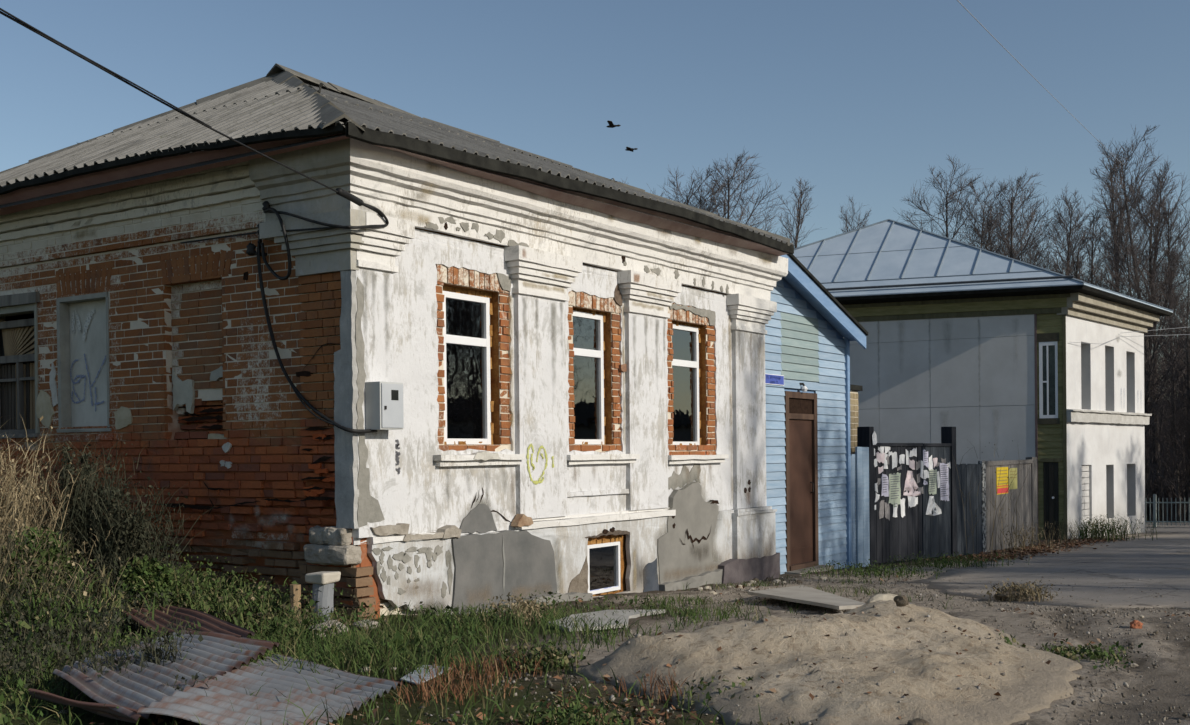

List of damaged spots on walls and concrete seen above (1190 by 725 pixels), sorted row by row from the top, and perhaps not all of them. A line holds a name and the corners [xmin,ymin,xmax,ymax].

peeling [424,216,529,247]
peeling [36,362,58,429]
peeling [114,406,133,430]
peeling [172,369,232,469]
spalling [301,427,335,497]
peeling [355,277,462,598]
peeling [668,463,701,490]